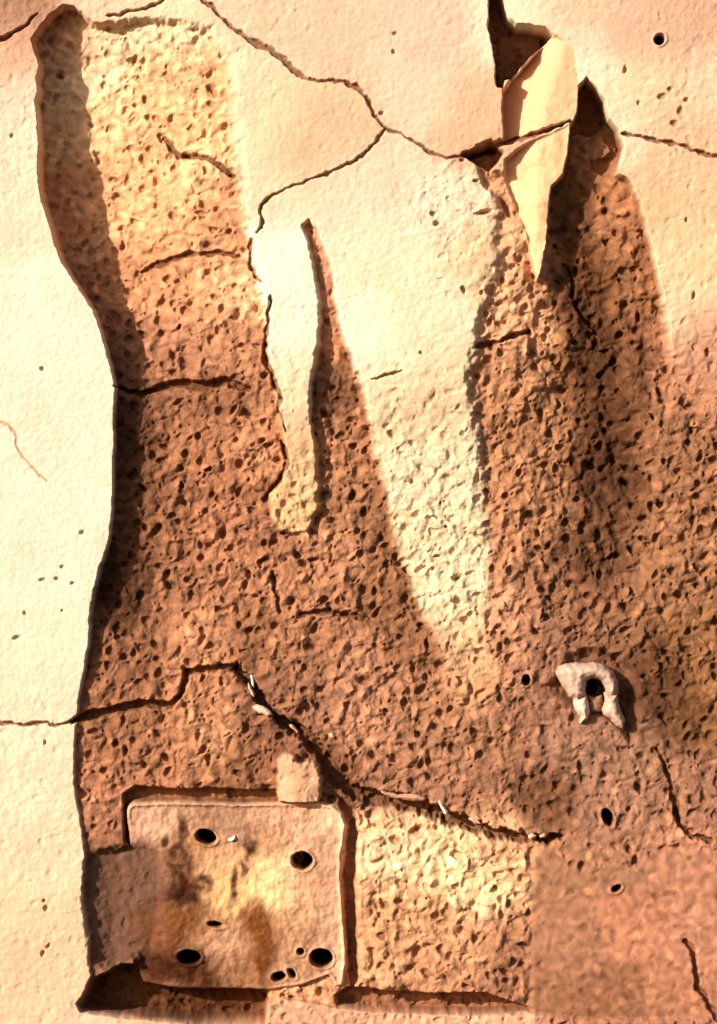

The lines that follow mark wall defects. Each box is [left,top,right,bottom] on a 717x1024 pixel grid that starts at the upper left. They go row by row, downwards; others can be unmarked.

spalling [487,0,553,88]
crack [620,131,717,158]
crack [106,0,572,503]
peeling [246,210,322,537]
peeling [364,392,499,718]
crack [0,662,564,846]
rust [161,820,212,902]
rust [143,951,236,1011]
rust [231,843,255,898]
rust [248,902,272,970]
spalling [77,785,546,1024]
crack [683,938,717,1022]